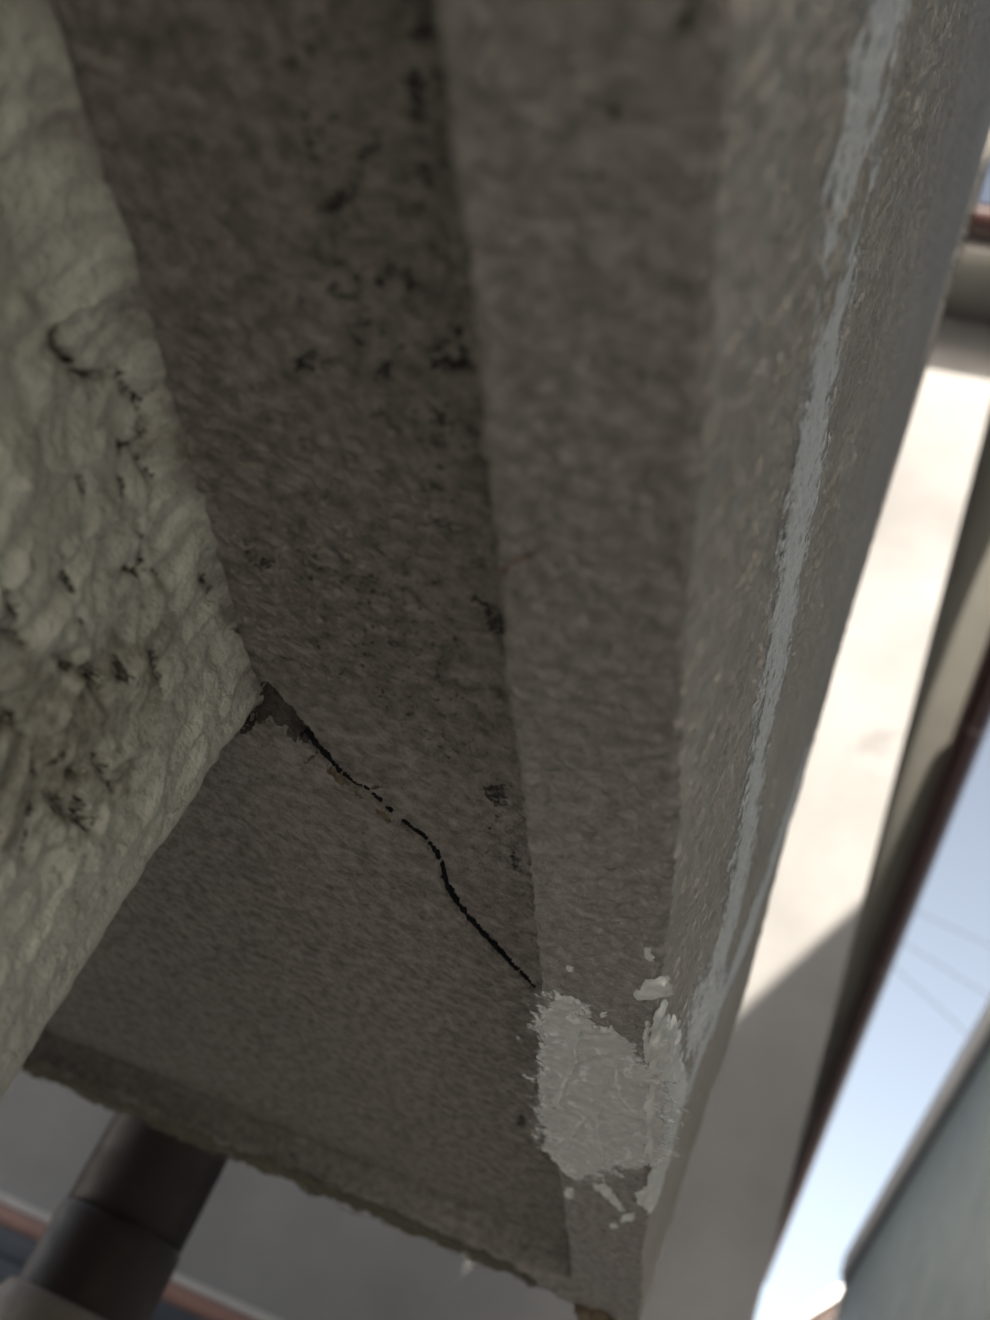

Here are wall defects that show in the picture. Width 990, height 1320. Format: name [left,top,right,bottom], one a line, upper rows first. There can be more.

crack [299,728,536,988]
peeling [522,947,688,1229]